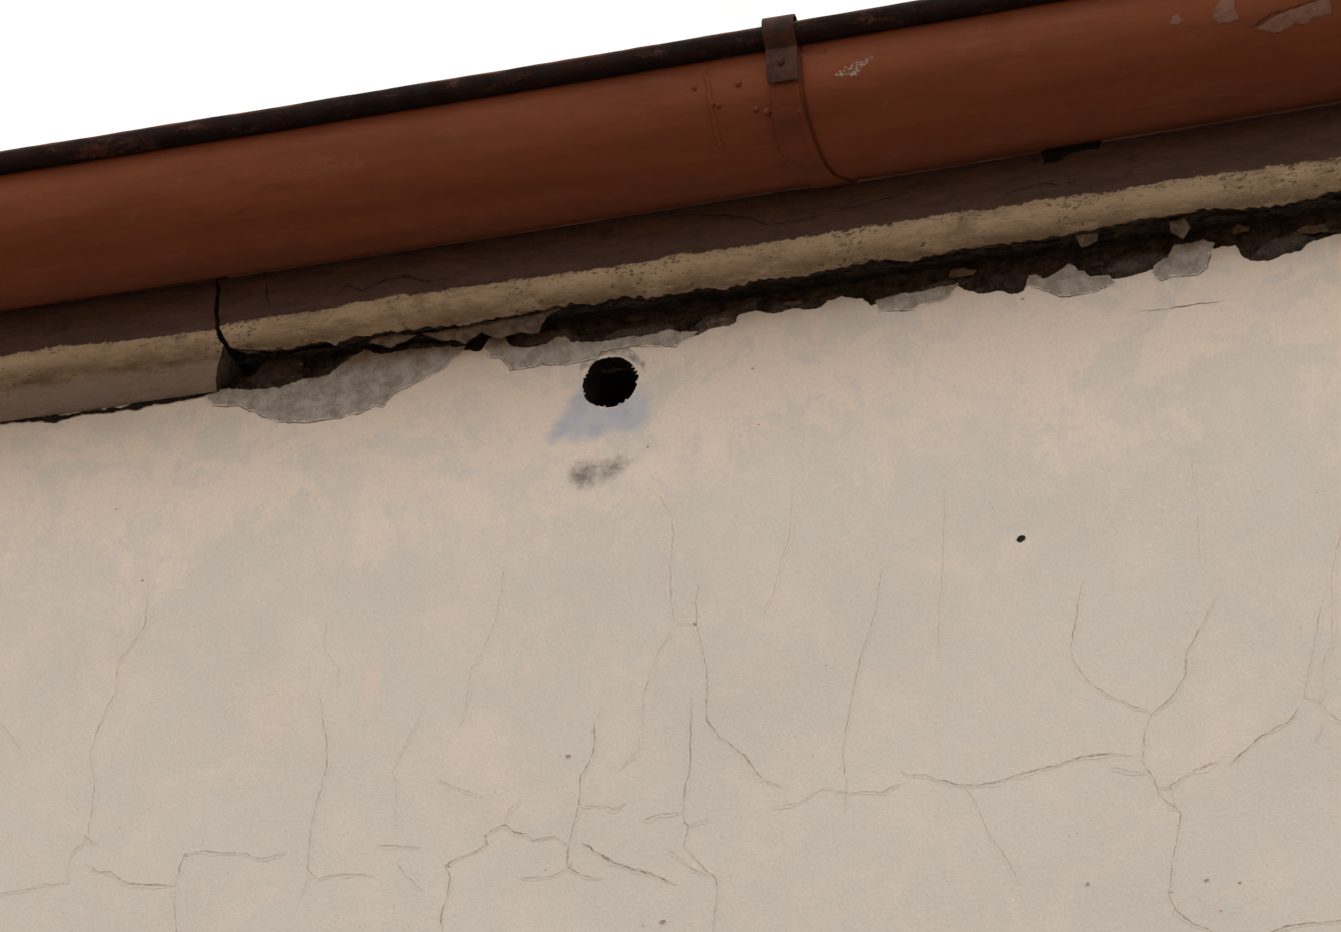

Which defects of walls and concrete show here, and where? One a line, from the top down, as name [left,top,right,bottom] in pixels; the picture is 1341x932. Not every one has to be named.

crack [216,277,237,351]
flaking render [205,191,1341,424]
crack [0,572,1300,932]
crack [1260,918,1341,932]